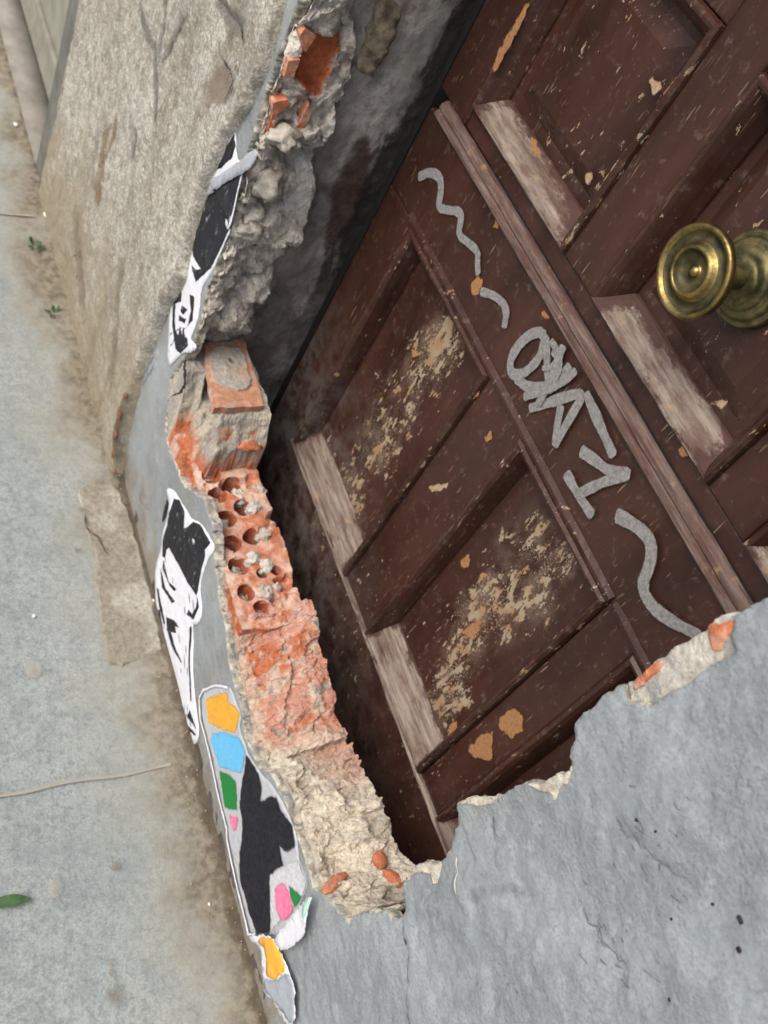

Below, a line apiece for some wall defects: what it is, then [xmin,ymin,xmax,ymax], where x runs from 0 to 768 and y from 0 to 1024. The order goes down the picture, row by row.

peeling [493,3,529,72]
peeling [649,77,676,95]
peeling [530,137,541,157]
peeling [471,275,483,295]
spalling [166,0,442,915]
peeling [462,618,483,639]
spalling [628,612,740,704]
peeling [469,709,523,761]
spalling [528,766,572,800]
spalling [461,795,498,806]